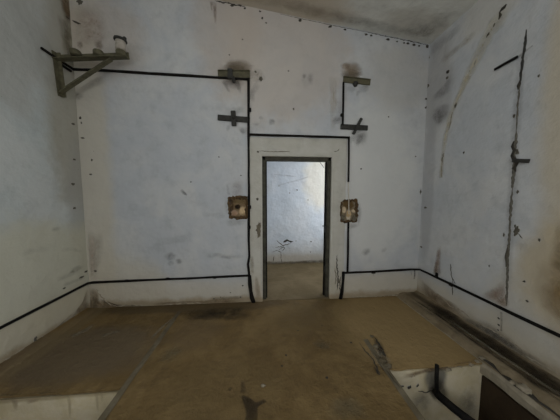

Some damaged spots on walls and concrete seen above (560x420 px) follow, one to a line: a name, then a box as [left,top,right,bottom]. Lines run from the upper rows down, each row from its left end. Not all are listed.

crack [503,29,527,306]
damp [418,302,560,397]